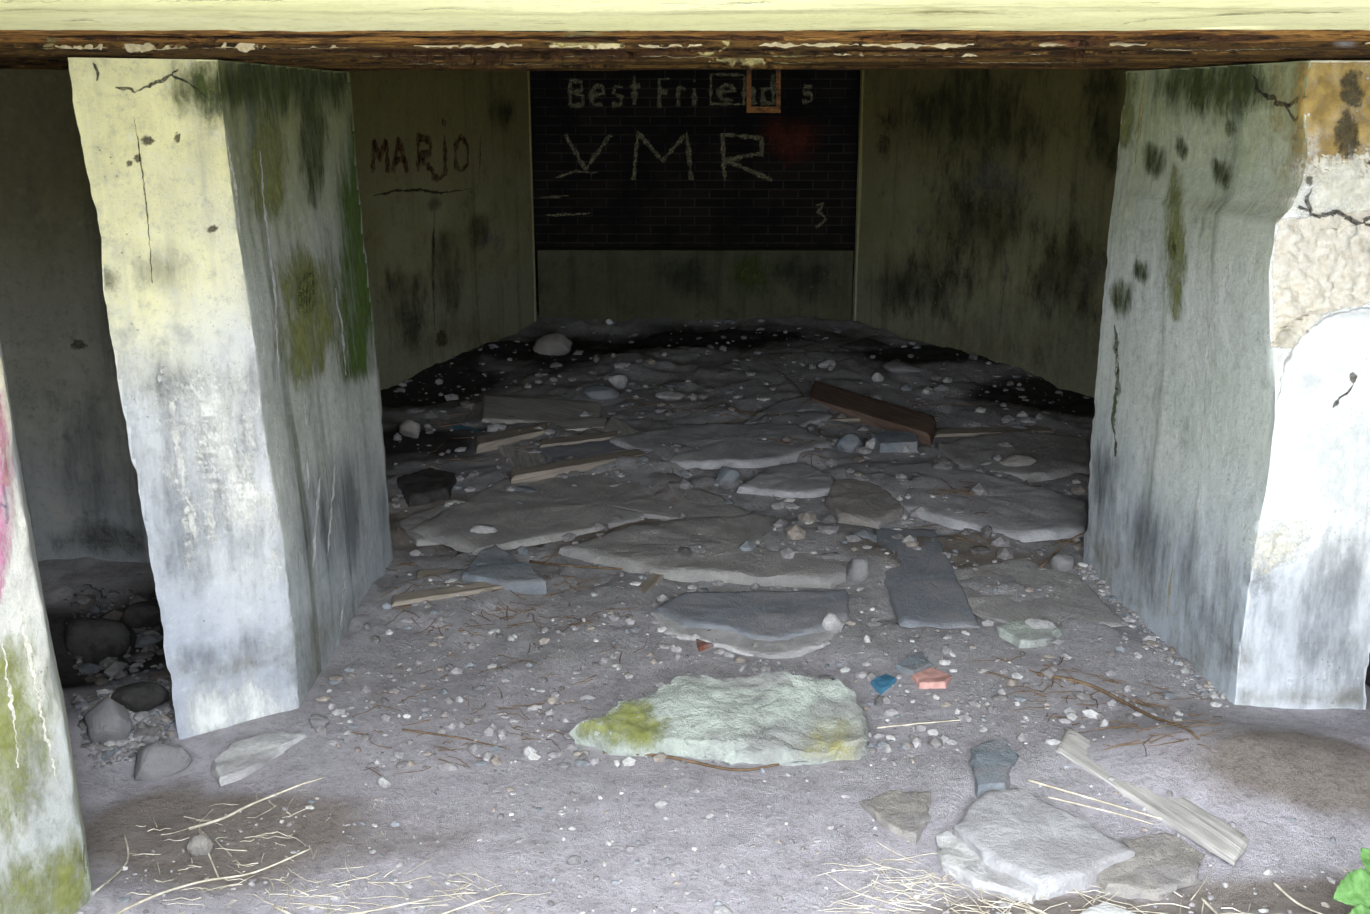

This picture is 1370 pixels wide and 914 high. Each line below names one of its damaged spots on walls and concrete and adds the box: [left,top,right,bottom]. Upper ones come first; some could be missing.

crack [93,63,206,283]
water stain [260,153,280,380]
water stain [336,292,346,375]
spalling [1270,62,1370,348]
crack [1298,188,1370,227]
water stain [304,397,358,573]